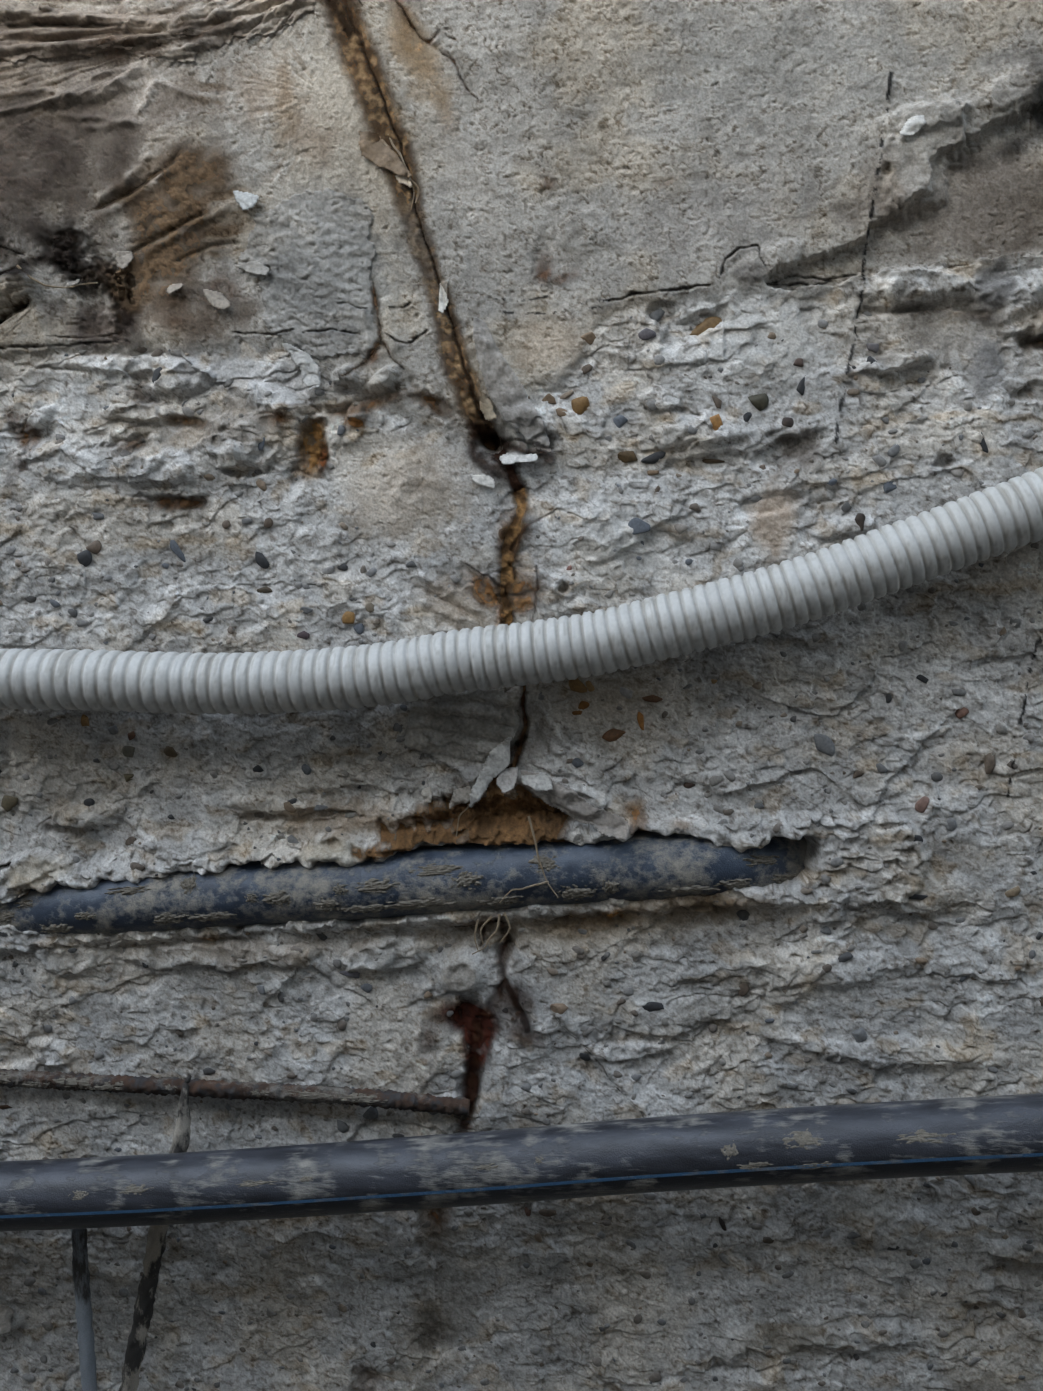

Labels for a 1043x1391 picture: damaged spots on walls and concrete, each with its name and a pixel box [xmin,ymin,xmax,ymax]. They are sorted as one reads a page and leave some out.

peeling [0,0,315,64]
crack [0,299,119,349]
spalling [0,188,452,525]
crack [234,0,555,626]
spalling [470,100,1043,505]
corrosion [340,395,398,428]
corrosion [418,393,446,413]
corrosion [472,576,536,619]
crack [505,685,528,769]
spalling [0,833,368,901]
corrosion [0,985,534,1130]